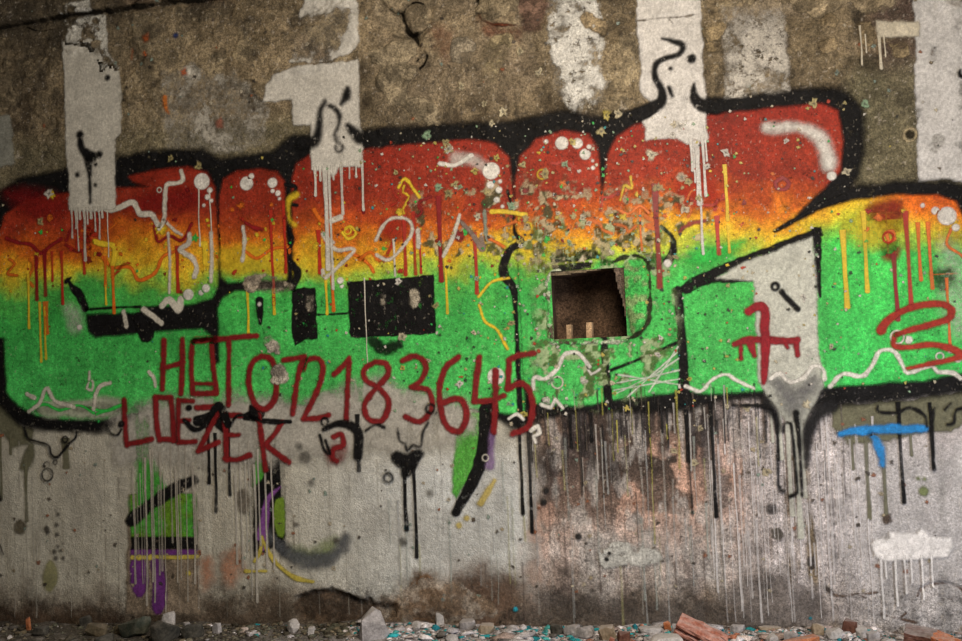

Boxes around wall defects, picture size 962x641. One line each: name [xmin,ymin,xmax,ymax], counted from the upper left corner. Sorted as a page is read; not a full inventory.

crack [0,0,209,31]
crack [390,1,428,69]
peeling [464,184,502,208]
peeling [411,198,449,256]
spalling [483,184,692,401]
water stain [771,528,783,540]
water stain [0,602,118,625]
water stain [449,568,834,627]